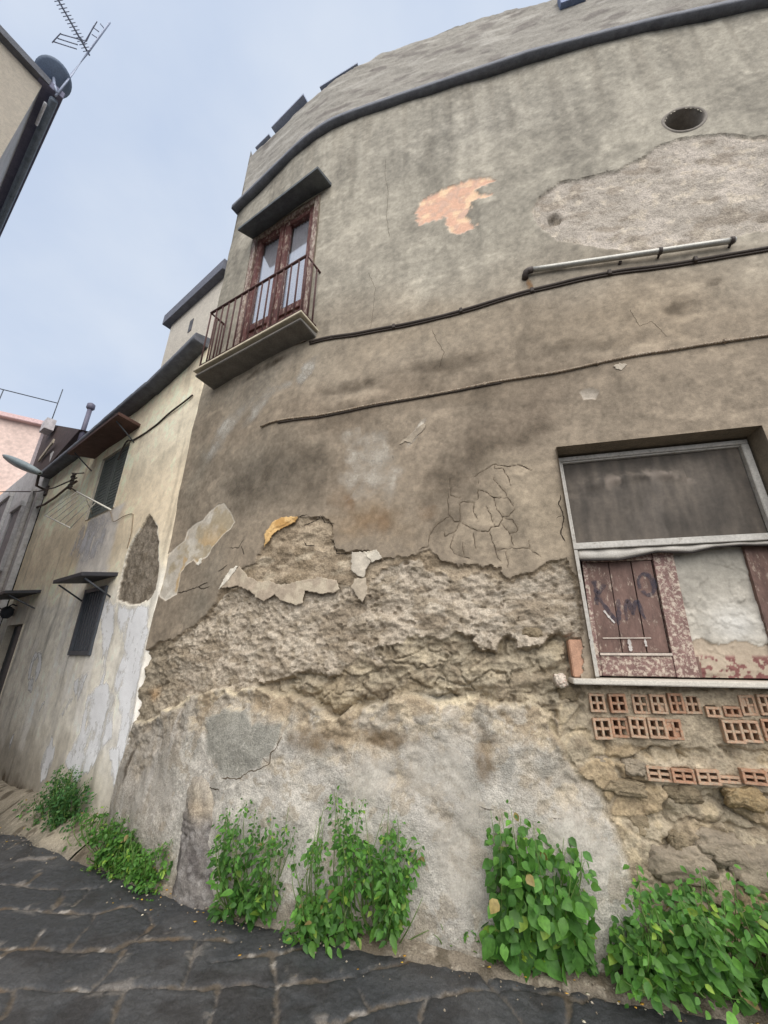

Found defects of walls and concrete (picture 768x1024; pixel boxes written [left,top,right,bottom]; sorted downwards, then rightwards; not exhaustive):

peeling [532,133,768,251]
crack [421,456,565,565]
crack [210,736,282,790]
spalling [40,502,768,970]